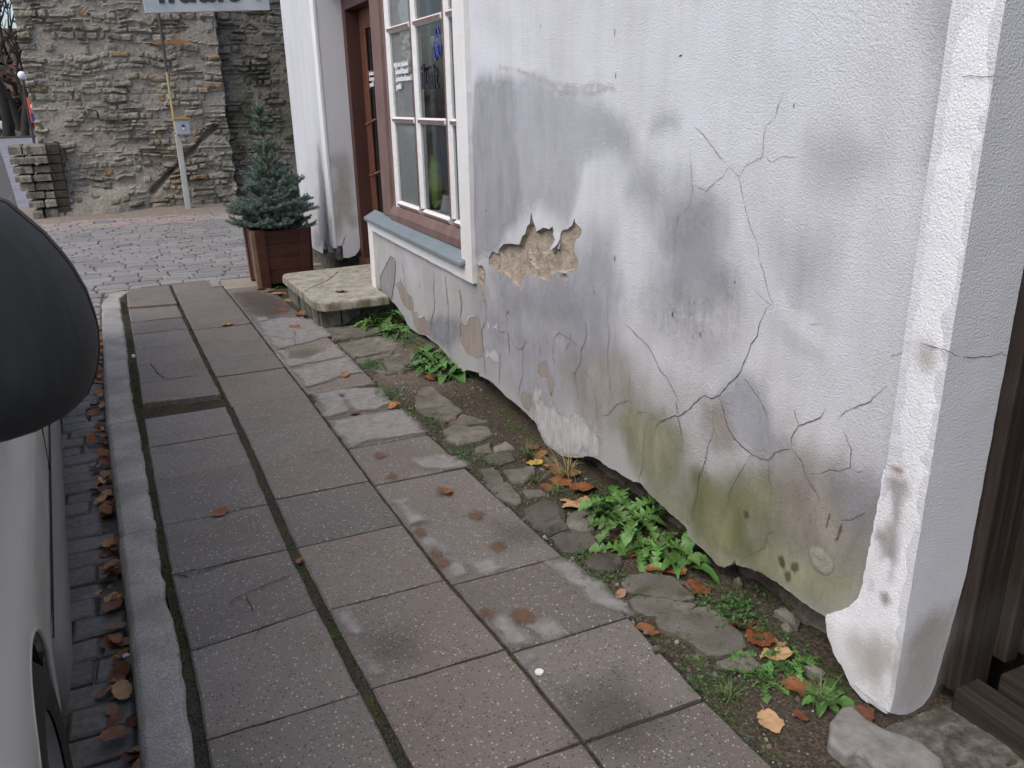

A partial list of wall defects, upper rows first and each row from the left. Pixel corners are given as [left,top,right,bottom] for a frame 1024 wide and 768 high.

damp [473,70,627,251]
peeling [396,280,429,336]
flaking render [460,213,582,358]
crack [431,92,885,512]
damp [637,172,723,293]
crack [892,343,1009,358]
mould [779,557,798,581]